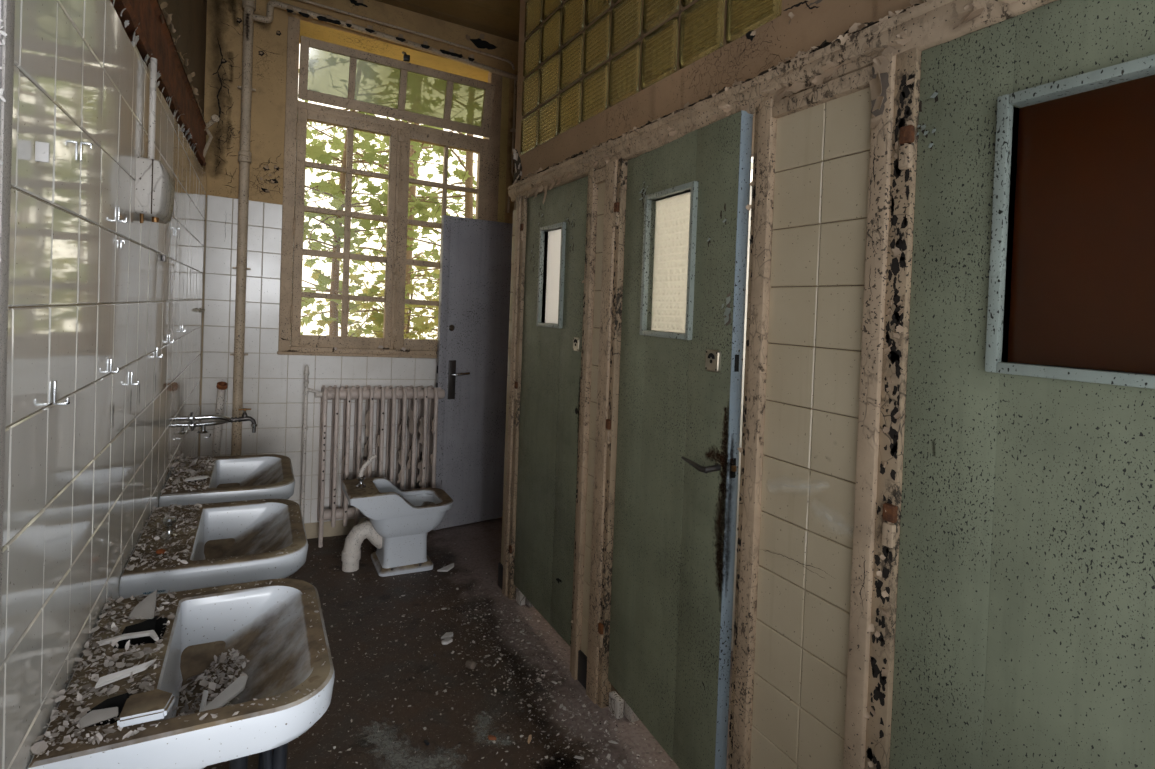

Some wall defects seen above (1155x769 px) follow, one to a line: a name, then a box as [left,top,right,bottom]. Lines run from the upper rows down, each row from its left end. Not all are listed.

crack [207,23,284,195]
peeling [286,5,377,35]
peeling [396,34,497,63]
peeling [512,148,583,225]
peeling [865,30,938,481]
water stain [718,413,733,612]
peeling [864,536,892,769]